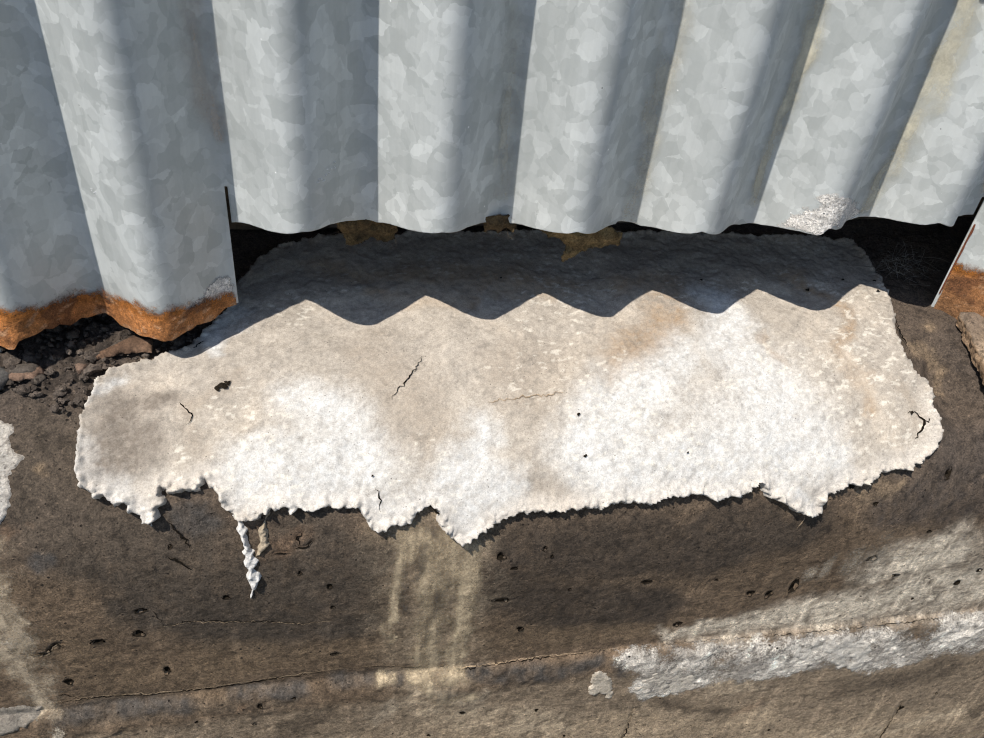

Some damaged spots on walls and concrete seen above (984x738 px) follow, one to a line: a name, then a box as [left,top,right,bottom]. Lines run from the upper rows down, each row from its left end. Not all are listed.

rust [934,224,984,320]
rust [0,290,237,350]
peeling [74,229,944,598]
peeling [0,420,25,524]
crack [168,523,192,570]
crack [275,533,314,555]
crack [20,644,64,657]
water stain [376,528,481,698]
crack [53,614,965,704]
water stain [616,610,984,700]